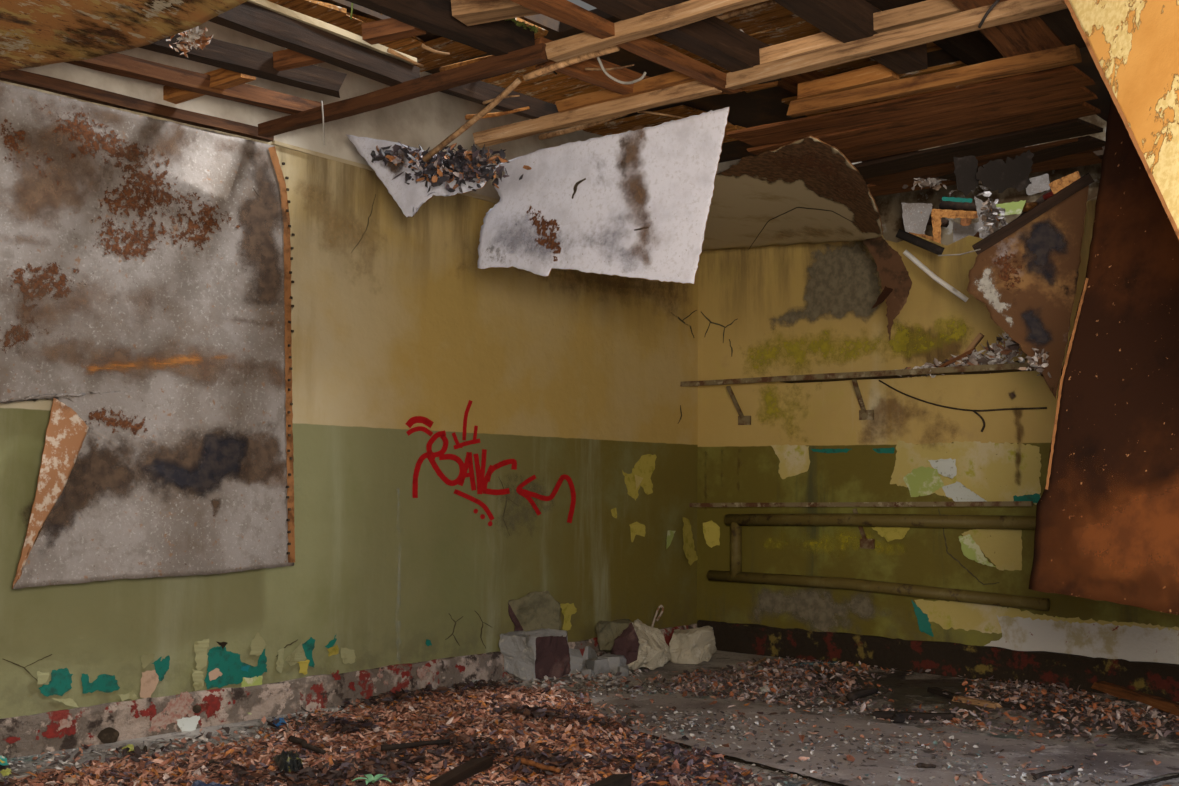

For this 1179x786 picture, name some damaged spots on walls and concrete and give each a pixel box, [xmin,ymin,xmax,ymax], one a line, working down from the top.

peeling [526,206,561,261]
peeling [622,454,657,501]
peeling [771,444,851,479]
peeling [873,440,1041,505]
peeling [630,522,646,542]
peeling [666,517,720,566]
peeling [872,527,910,542]
peeling [959,529,1022,571]
peeling [912,599,1179,664]
peeling [35,633,356,744]